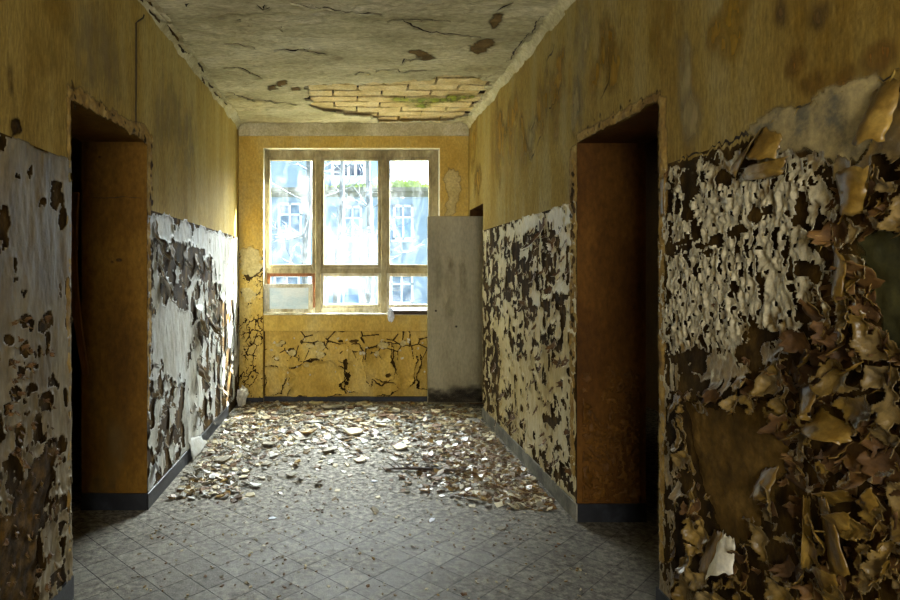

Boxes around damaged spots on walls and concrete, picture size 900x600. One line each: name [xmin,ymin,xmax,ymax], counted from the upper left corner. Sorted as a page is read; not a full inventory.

crack [224,2,481,105]
spalling [268,75,491,121]
spalling [408,50,436,61]
crack [485,16,544,80]
peeling [0,80,427,600]
peeling [482,71,900,600]